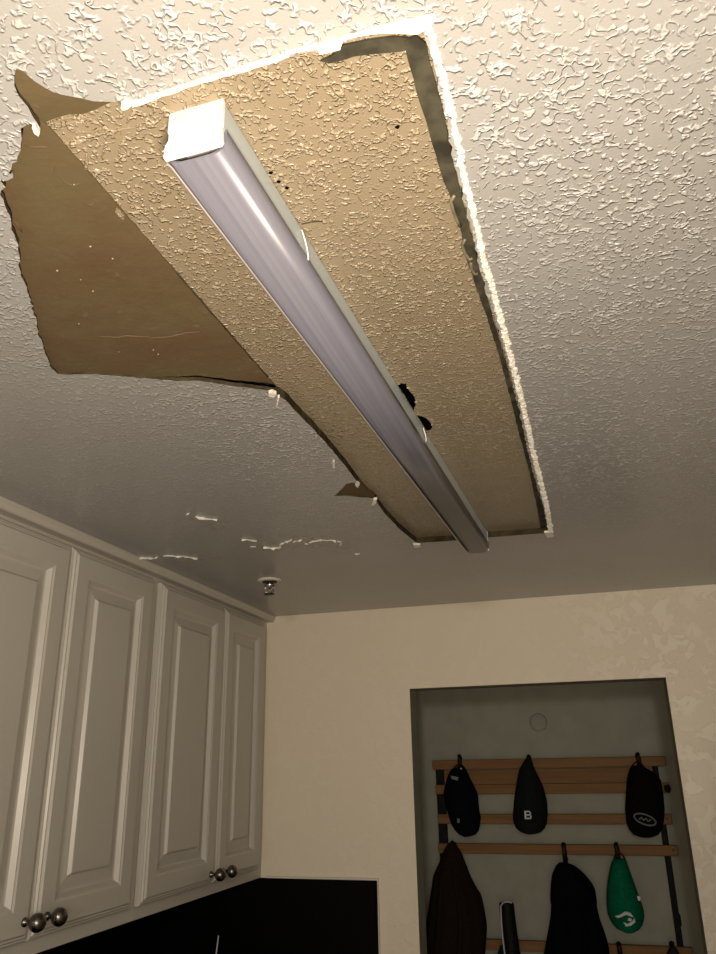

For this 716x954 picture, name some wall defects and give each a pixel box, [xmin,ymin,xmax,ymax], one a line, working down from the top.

peeling [121,99,132,111]